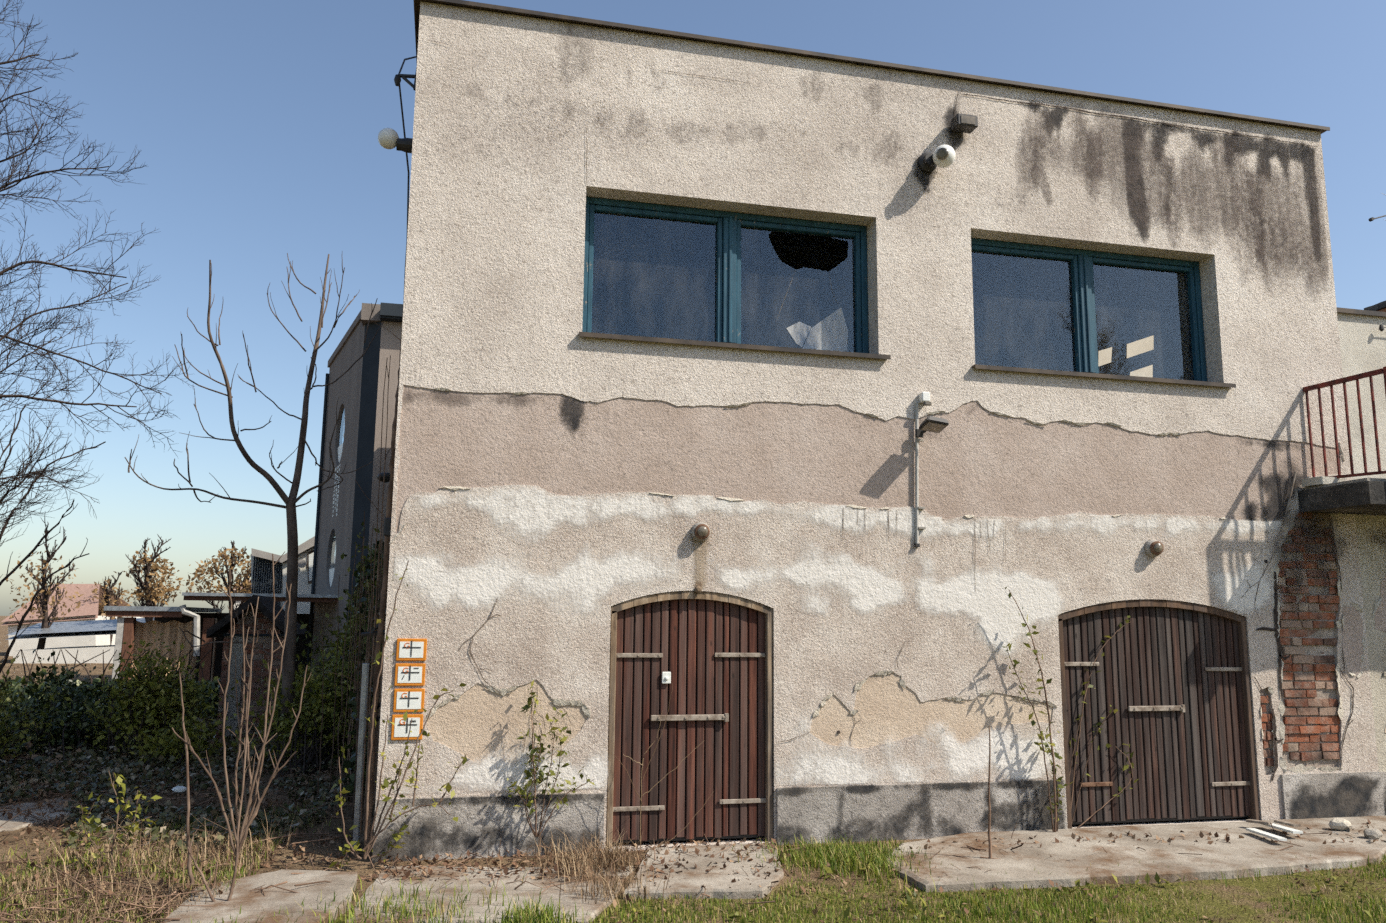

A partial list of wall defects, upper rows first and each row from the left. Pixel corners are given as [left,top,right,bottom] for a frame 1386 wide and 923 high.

damp [1022,101,1327,284]
damp [561,397,584,431]
damp [418,467,1305,540]
damp [394,550,677,612]
flaking render [389,385,1345,775]
damp [720,543,1064,655]
damp [1212,564,1275,614]
crack [458,600,502,694]
crack [523,693,572,772]
damp [776,723,1065,845]
damp [1291,776,1386,819]